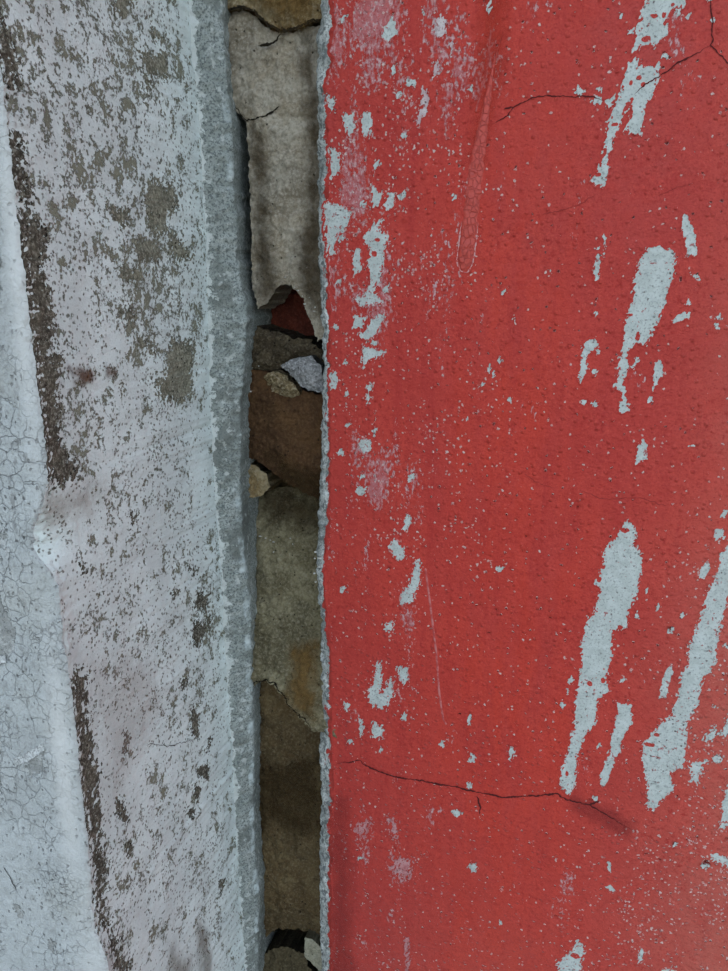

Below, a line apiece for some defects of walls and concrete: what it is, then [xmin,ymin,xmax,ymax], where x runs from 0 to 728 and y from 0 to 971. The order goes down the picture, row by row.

crack [229,5,317,47]
crack [636,0,728,93]
crack [497,95,601,122]
peeling [321,159,406,398]
peeling [575,336,601,386]
peeling [610,211,700,416]
peeling [382,514,425,634]
peeling [341,658,410,754]
peeling [557,517,648,801]
peeling [639,510,728,813]
crack [337,760,630,829]
peeling [554,937,589,971]